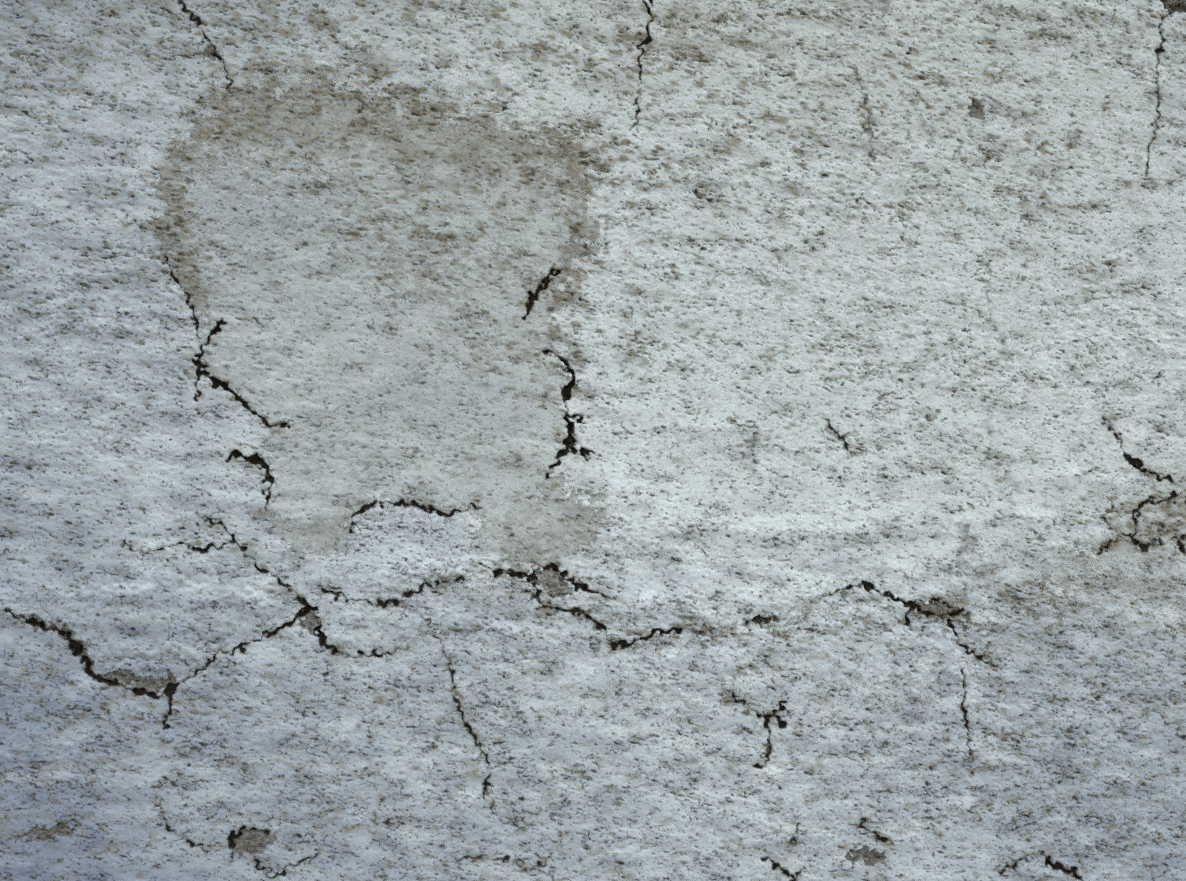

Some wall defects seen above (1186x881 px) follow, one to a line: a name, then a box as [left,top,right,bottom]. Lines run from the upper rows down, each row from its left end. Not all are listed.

spalling [1160,0,1186,17]
crack [522,268,562,320]
crack [162,256,290,428]
crack [543,350,594,478]
crack [220,449,274,509]
crack [349,499,478,533]
crack [1097,417,1186,555]
crack [4,512,682,828]
crack [829,580,990,755]
crack [732,692,787,769]
crack [155,797,321,879]
crack [999,851,1083,881]